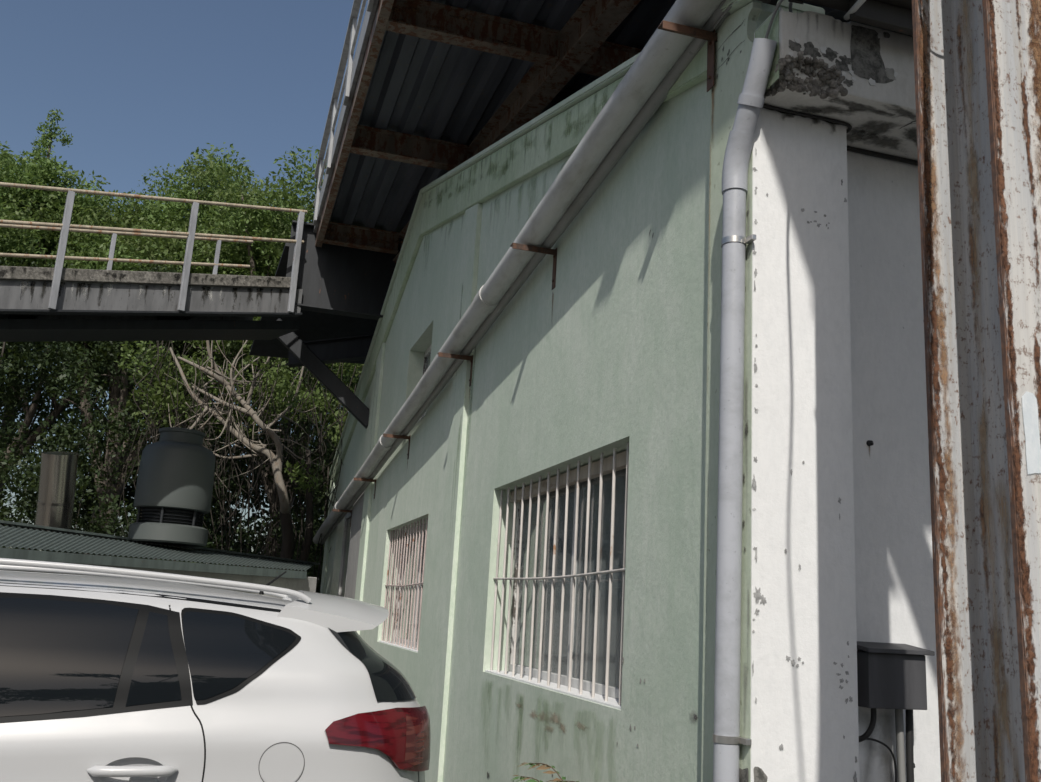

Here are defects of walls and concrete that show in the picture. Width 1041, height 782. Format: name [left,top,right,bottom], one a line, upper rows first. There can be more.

spalling [764,25,898,99]
rust [968,154,978,339]
rust [980,0,1041,782]
peeling [739,767,767,782]